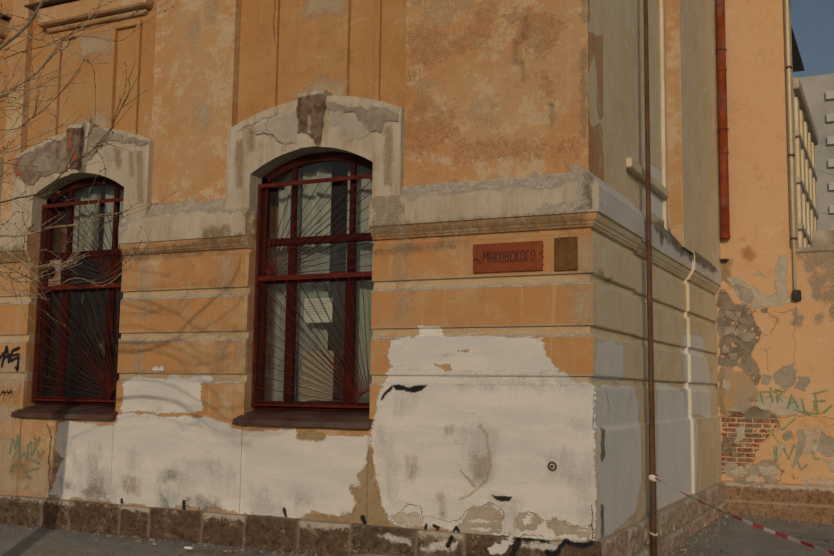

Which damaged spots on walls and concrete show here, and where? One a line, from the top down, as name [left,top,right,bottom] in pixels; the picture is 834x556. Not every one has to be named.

spalling [296,94,399,145]
spalling [12,127,84,186]
crack [721,306,797,370]
spalling [716,254,834,489]
peeling [378,533,411,546]
peeling [420,501,605,555]